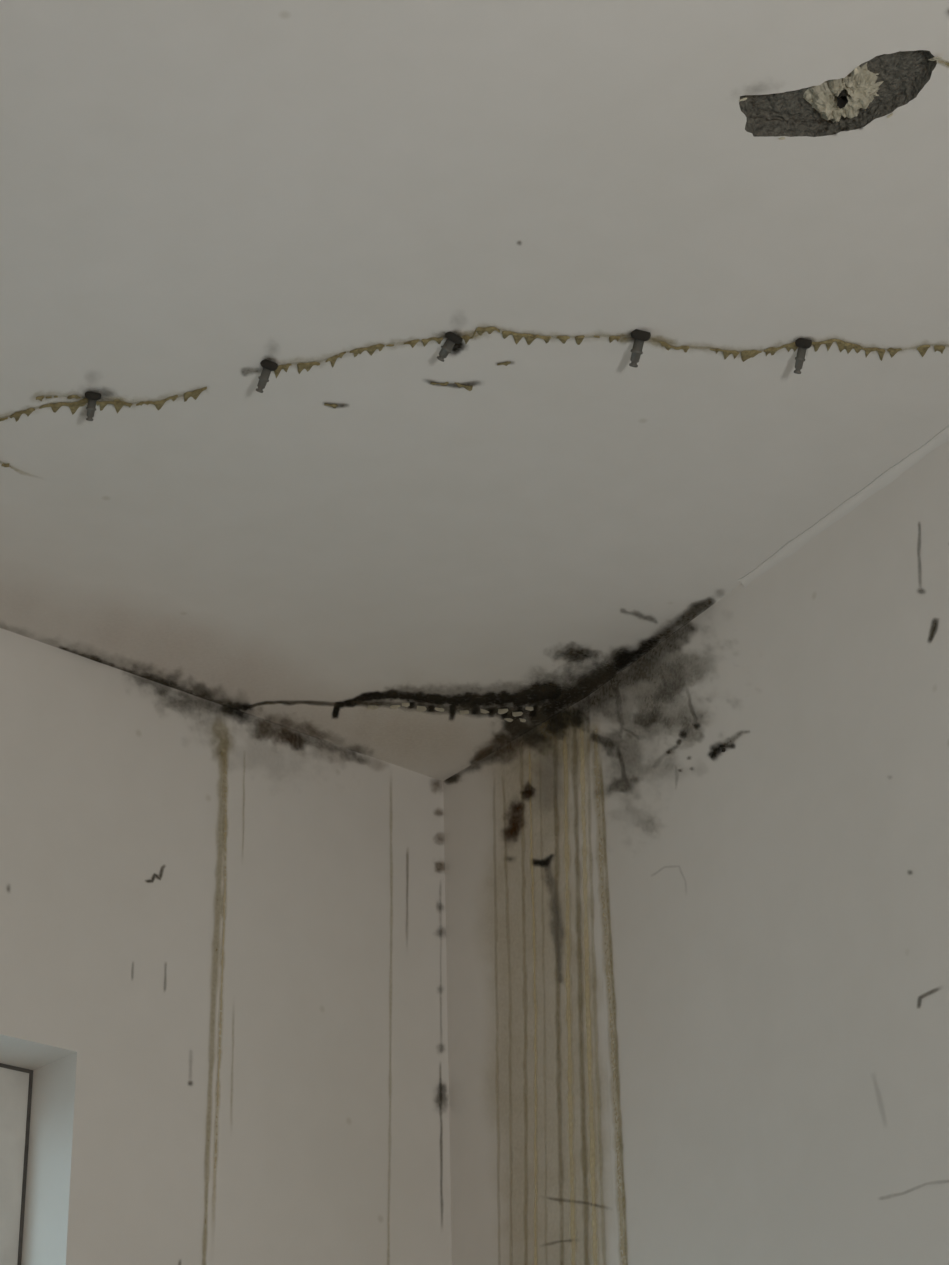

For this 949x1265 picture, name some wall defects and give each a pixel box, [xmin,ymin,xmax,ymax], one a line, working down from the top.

spalling [739,50,942,140]
crack [274,327,620,391]
crack [659,339,945,362]
crack [0,387,207,422]
crack [324,401,345,409]
leakage [59,647,251,719]
leakage [260,724,308,749]
leakage [453,599,713,1265]